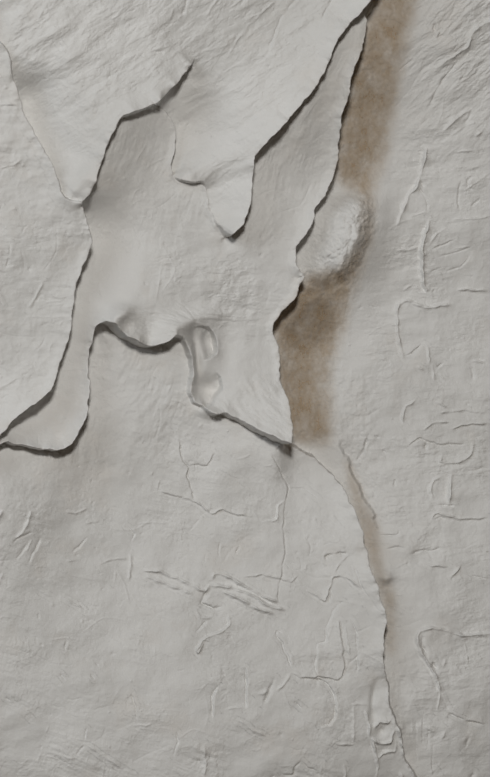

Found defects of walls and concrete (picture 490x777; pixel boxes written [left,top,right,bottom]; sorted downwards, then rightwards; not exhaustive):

spalling [0,0,373,469]
crack [295,674,341,731]